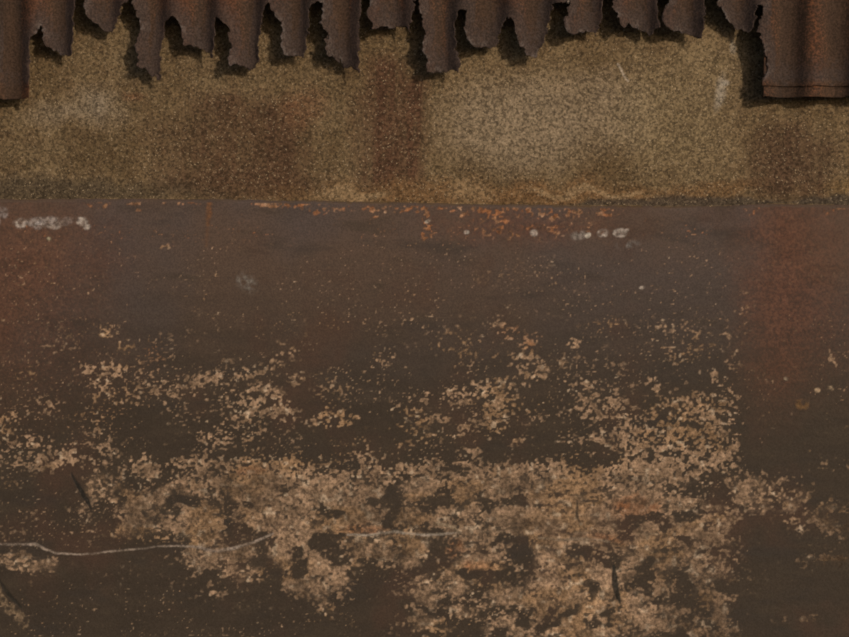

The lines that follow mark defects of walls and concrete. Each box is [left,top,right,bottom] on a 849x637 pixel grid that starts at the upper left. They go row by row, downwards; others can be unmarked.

leakage [13,78,134,136]
leakage [304,34,849,205]
leakage [0,167,234,242]
efflorescence [568,227,643,250]
peeling [0,203,849,637]
crack [0,531,275,556]
crack [0,578,30,630]